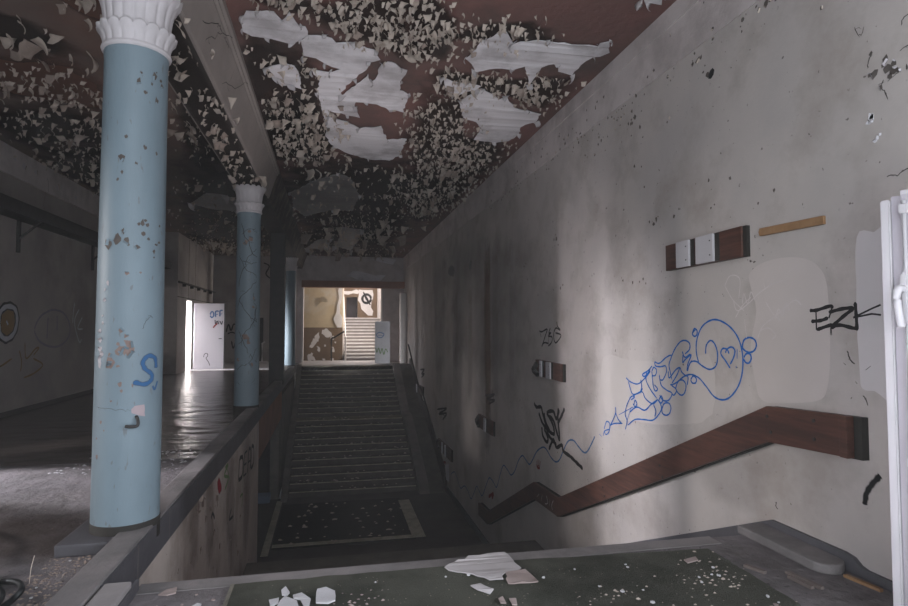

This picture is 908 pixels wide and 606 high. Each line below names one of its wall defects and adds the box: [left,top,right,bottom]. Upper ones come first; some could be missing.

peeling [0,13,103,196]
peeling [56,0,102,32]
peeling [105,17,267,258]
peeling [239,0,613,361]
peeling [635,0,662,12]
peeling [97,315,135,369]